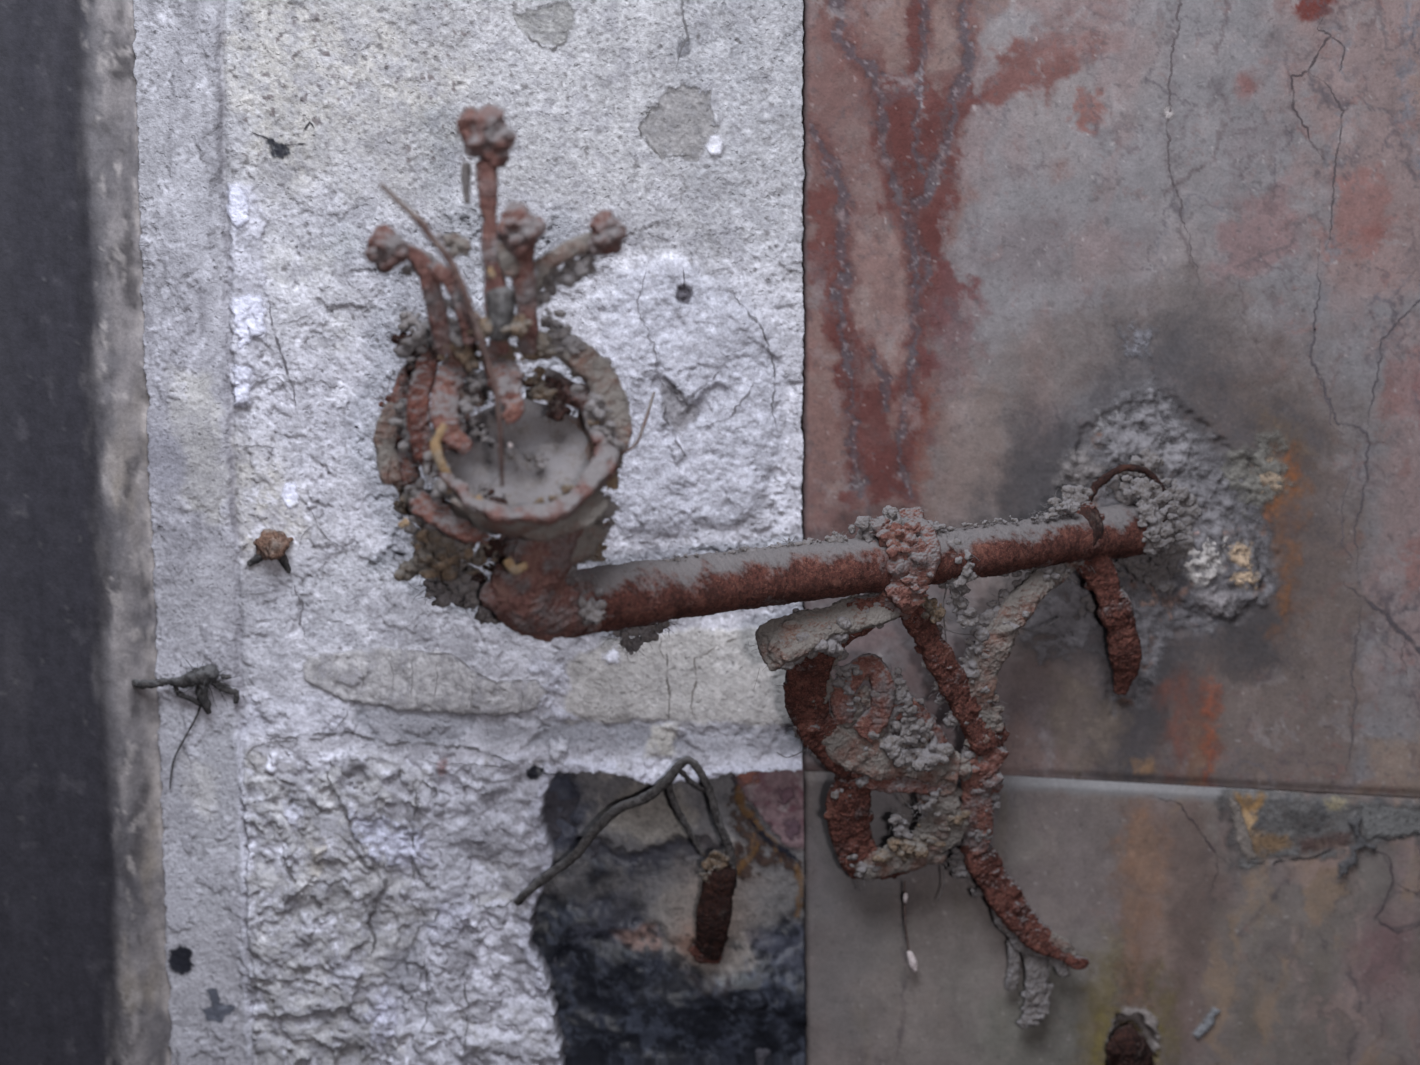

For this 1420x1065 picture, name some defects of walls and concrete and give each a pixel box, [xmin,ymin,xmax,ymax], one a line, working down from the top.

crack [1164,3,1200,280]
damp [1001,428,1078,521]
damp [1090,321,1302,581]
crack [1290,18,1420,771]
damp [1086,606,1282,782]
corrosion [728,785,803,917]
spalling [1217,788,1420,879]